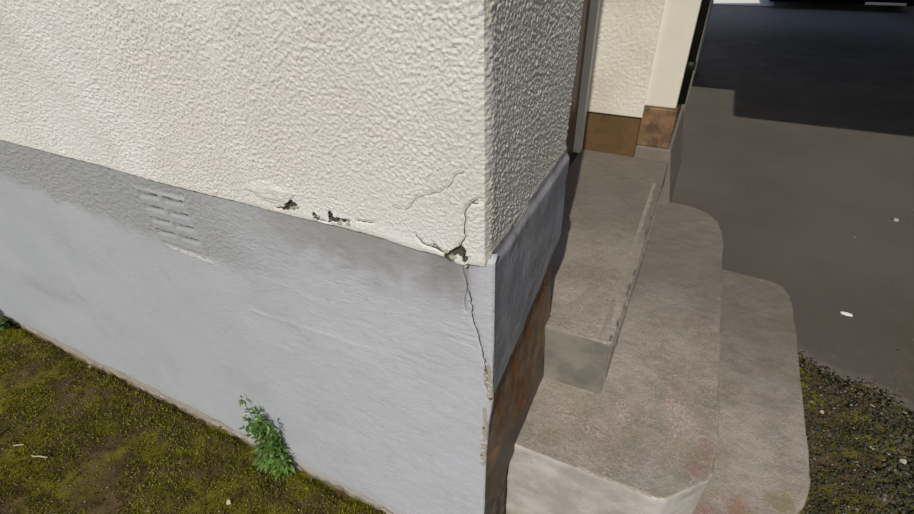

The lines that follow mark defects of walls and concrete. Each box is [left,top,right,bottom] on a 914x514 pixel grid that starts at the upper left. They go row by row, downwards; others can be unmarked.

flaking render [276,199,299,210]
flaking render [311,211,373,226]
flaking render [443,246,472,268]
crack [416,199,488,388]